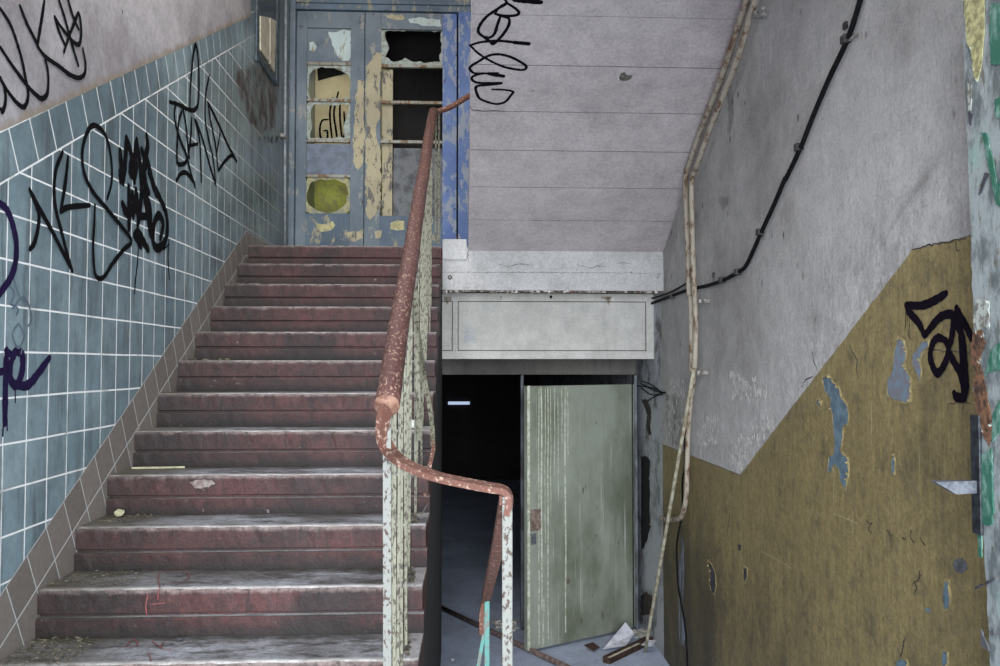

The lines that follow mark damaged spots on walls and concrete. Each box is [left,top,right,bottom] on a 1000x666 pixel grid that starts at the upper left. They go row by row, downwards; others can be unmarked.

peeling [964,0,985,126]
peeling [815,373,850,491]
peeling [886,336,930,404]
peeling [973,299,990,338]
rust [971,330,992,446]